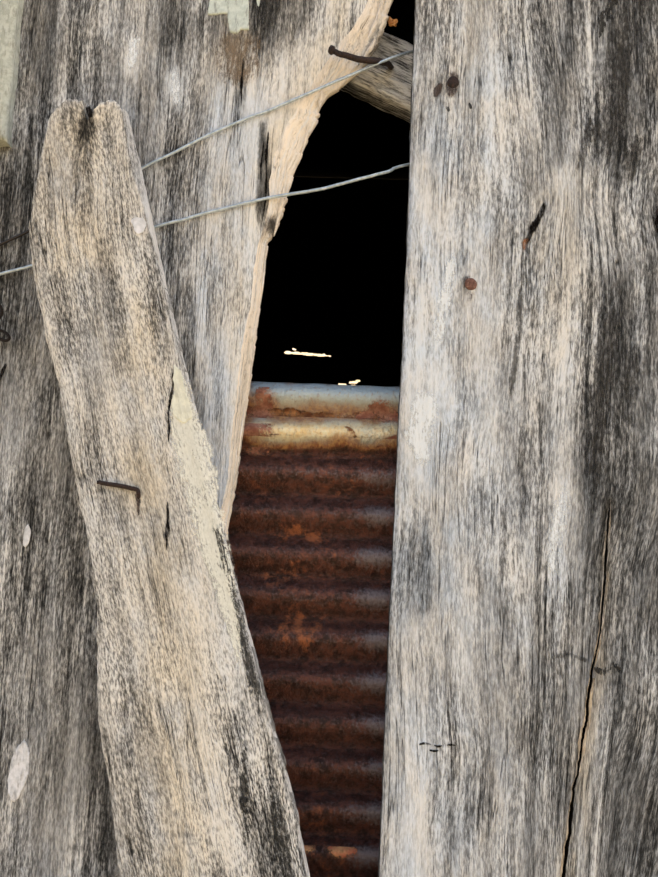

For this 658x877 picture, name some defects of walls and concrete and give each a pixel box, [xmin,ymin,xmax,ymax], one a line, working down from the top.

corrosion [243,387,398,438]
crack [552,500,622,877]
corrosion [328,846,358,858]